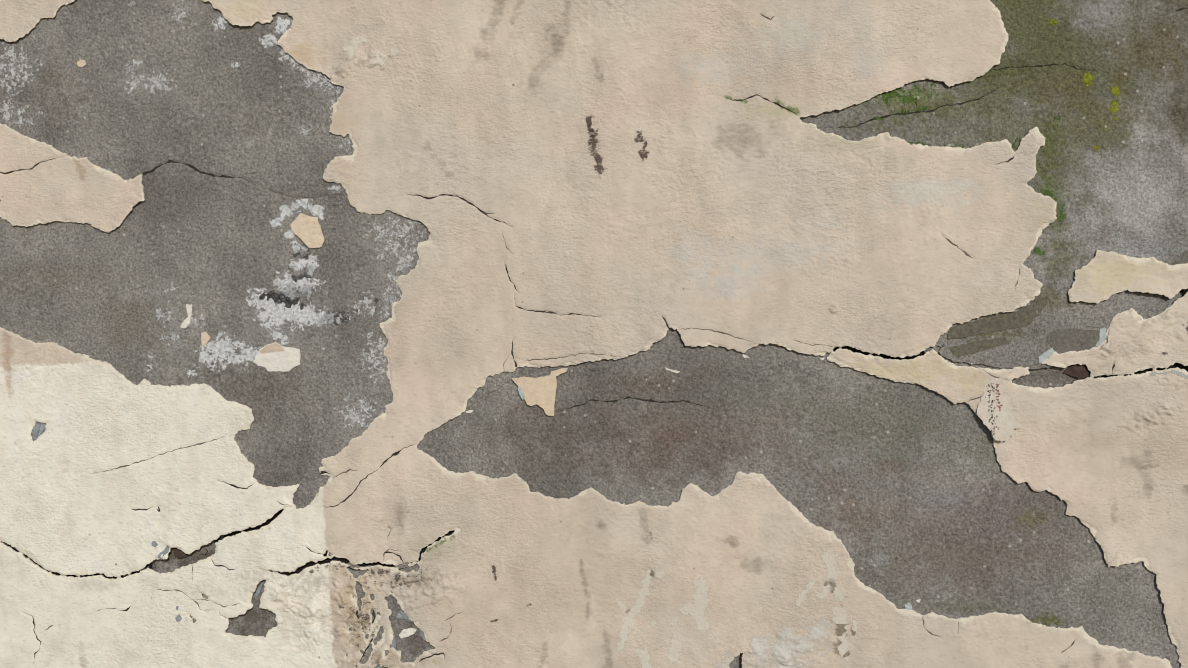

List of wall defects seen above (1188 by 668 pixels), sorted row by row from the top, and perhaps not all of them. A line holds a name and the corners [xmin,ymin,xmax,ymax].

water stain [259,17,343,121]
crack [728,94,796,114]
peeling [0,0,431,509]
water stain [155,281,261,378]
water stain [244,198,429,430]
peeling [417,0,1188,668]
crack [794,340,941,360]
crack [1,501,289,619]
peeling [141,535,224,573]
peeling [226,570,284,637]
crack [270,526,455,576]
peeling [339,561,435,668]